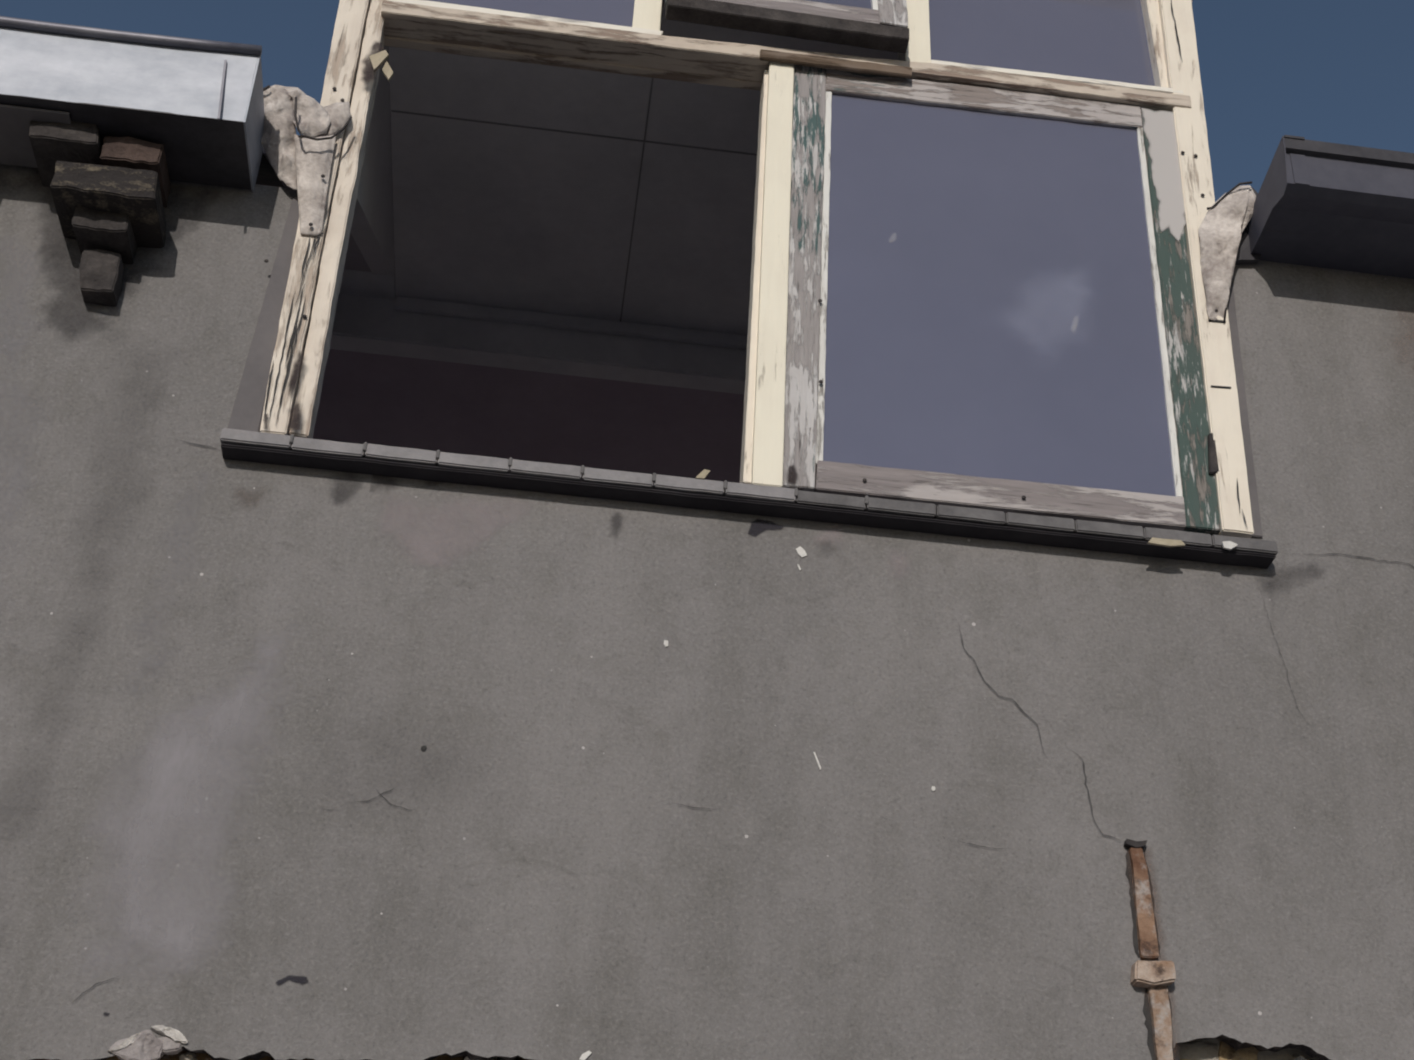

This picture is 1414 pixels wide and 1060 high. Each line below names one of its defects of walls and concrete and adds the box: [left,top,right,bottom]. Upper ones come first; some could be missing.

spalling [159,1051,212,1060]
spalling [1174,1039,1321,1060]